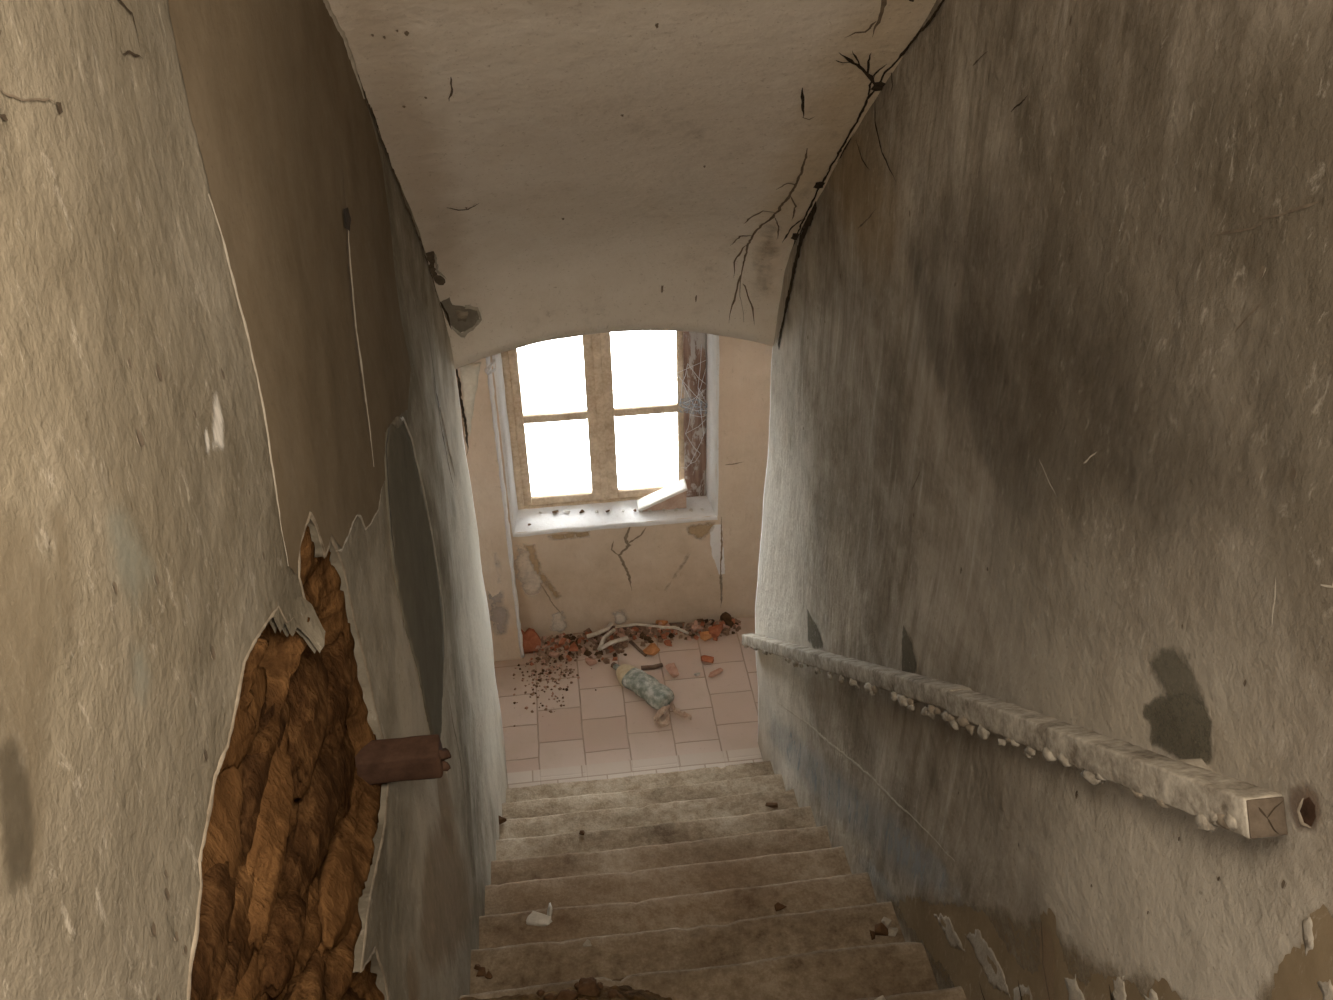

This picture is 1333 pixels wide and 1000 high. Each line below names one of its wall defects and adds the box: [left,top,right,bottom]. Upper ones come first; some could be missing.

crack [729,0,945,348]
spalling [426,251,482,338]
flaking render [168,0,411,1000]
crack [611,527,646,591]
flaking render [888,895,1185,1000]
flaking render [1264,904,1333,1000]